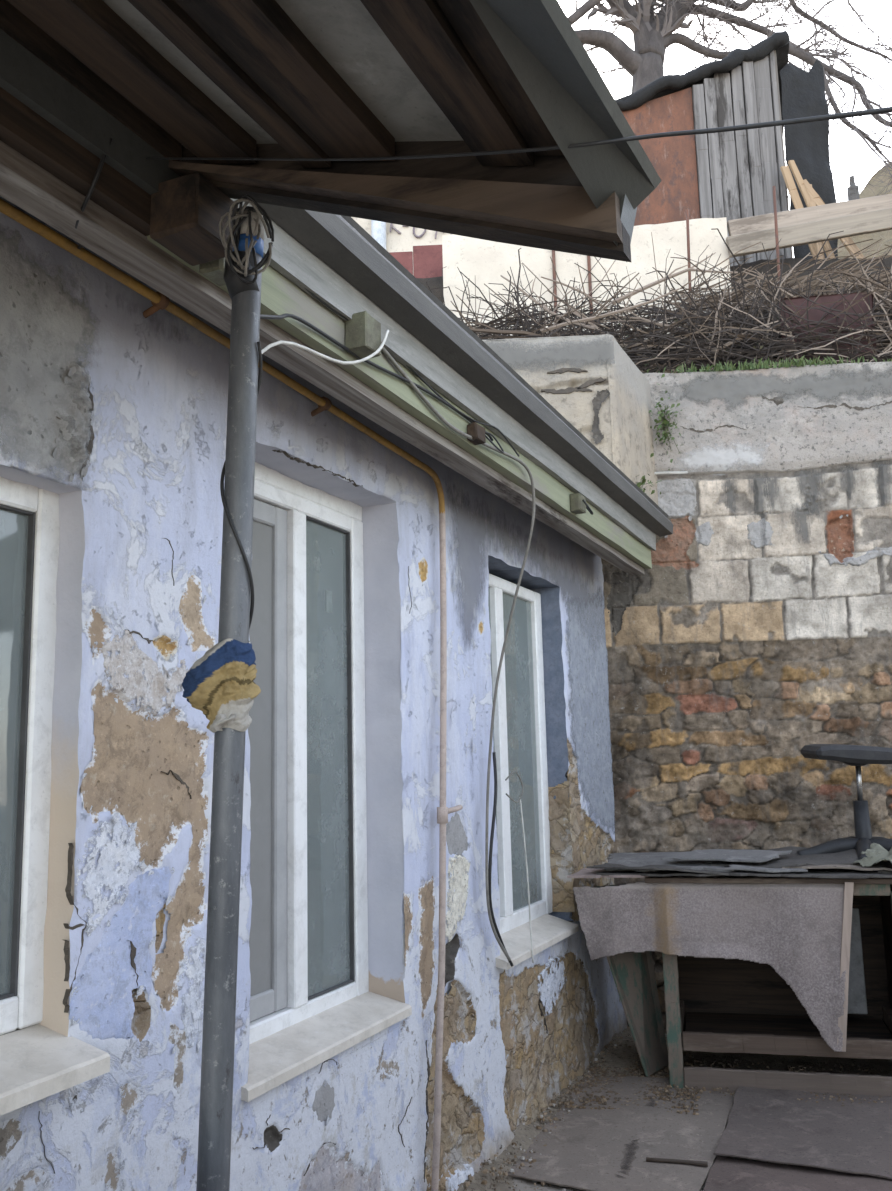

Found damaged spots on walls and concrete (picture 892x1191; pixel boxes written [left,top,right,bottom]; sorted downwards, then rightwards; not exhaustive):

flaking render [0,231,95,489]
crack [272,450,363,487]
flaking render [651,515,699,570]
spalling [825,514,855,567]
peeling [75,575,216,1094]
flaking render [499,951,599,1134]
flaking render [264,1125,284,1153]